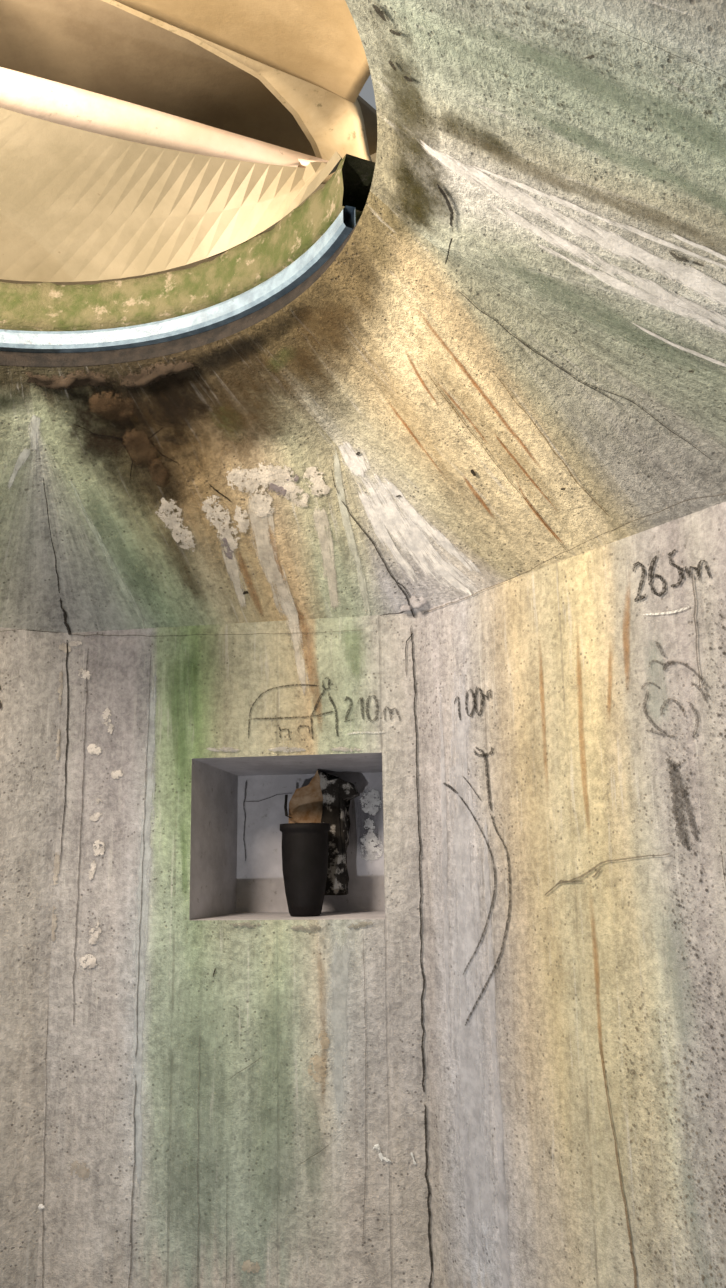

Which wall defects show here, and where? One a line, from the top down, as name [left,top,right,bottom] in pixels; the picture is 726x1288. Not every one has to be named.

crack [437,184,713,461]
water stain [220,536,245,606]
water stain [249,493,306,693]
crack [0,372,725,1288]